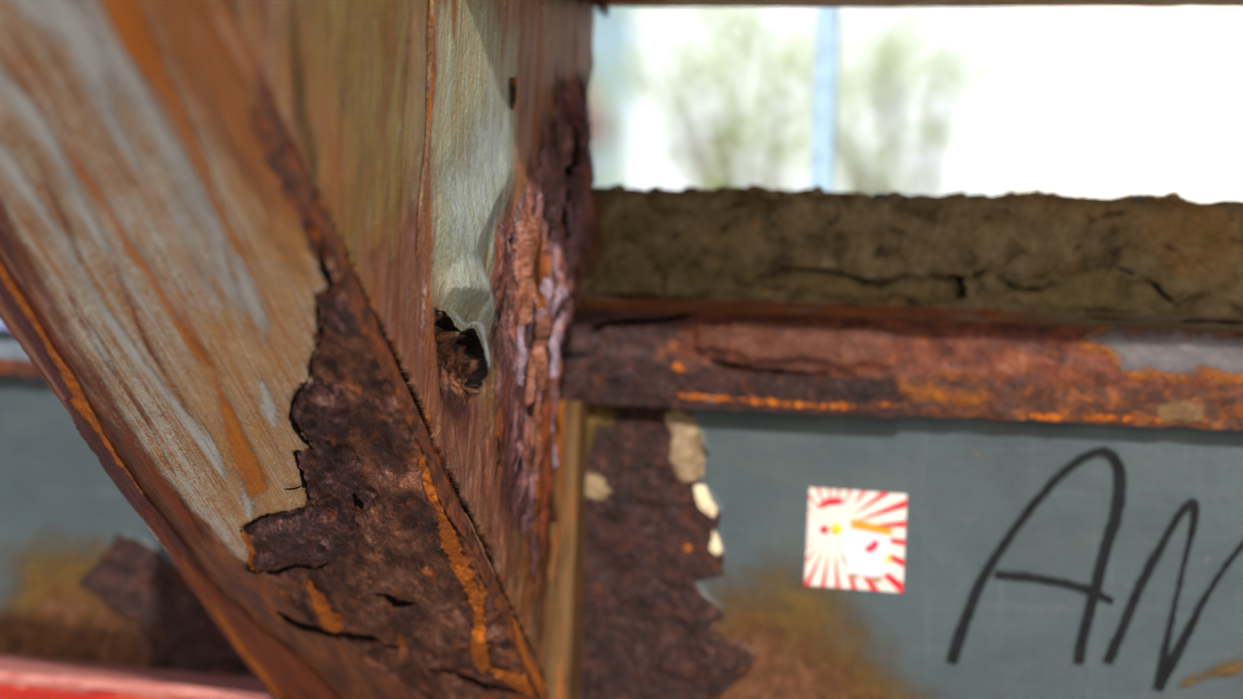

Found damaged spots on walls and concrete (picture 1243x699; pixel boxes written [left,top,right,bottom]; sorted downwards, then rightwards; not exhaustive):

corrosion [0,0,267,497]
corrosion [0,201,358,699]
corrosion [290,6,318,179]
peeling [245,217,538,699]
crack [239,197,545,693]
corrosion [422,0,436,163]
corrosion [411,437,550,699]
corrosion [437,67,596,625]
corrosion [565,0,668,18]
corrosion [1022,412,1174,423]